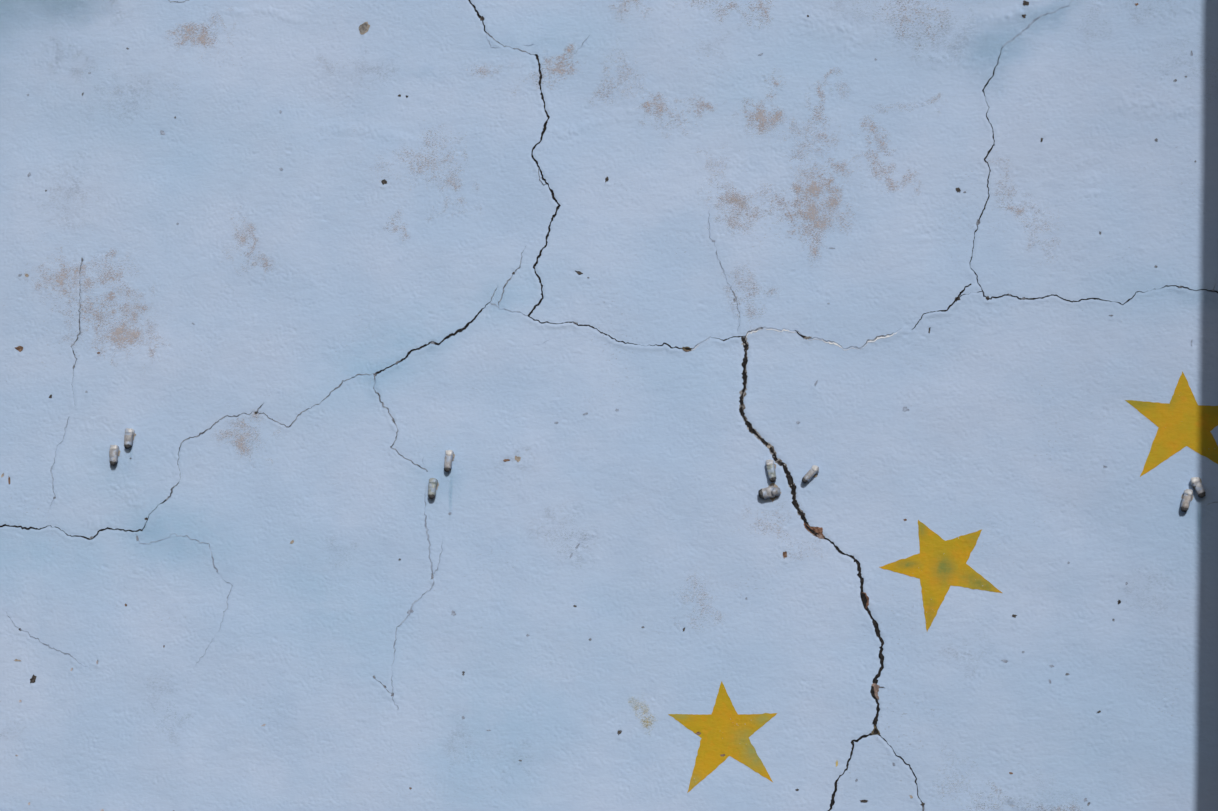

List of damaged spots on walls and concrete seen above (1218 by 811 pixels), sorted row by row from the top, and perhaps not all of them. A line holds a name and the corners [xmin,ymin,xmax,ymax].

crack [0,0,924,811]
crack [913,4,1218,329]